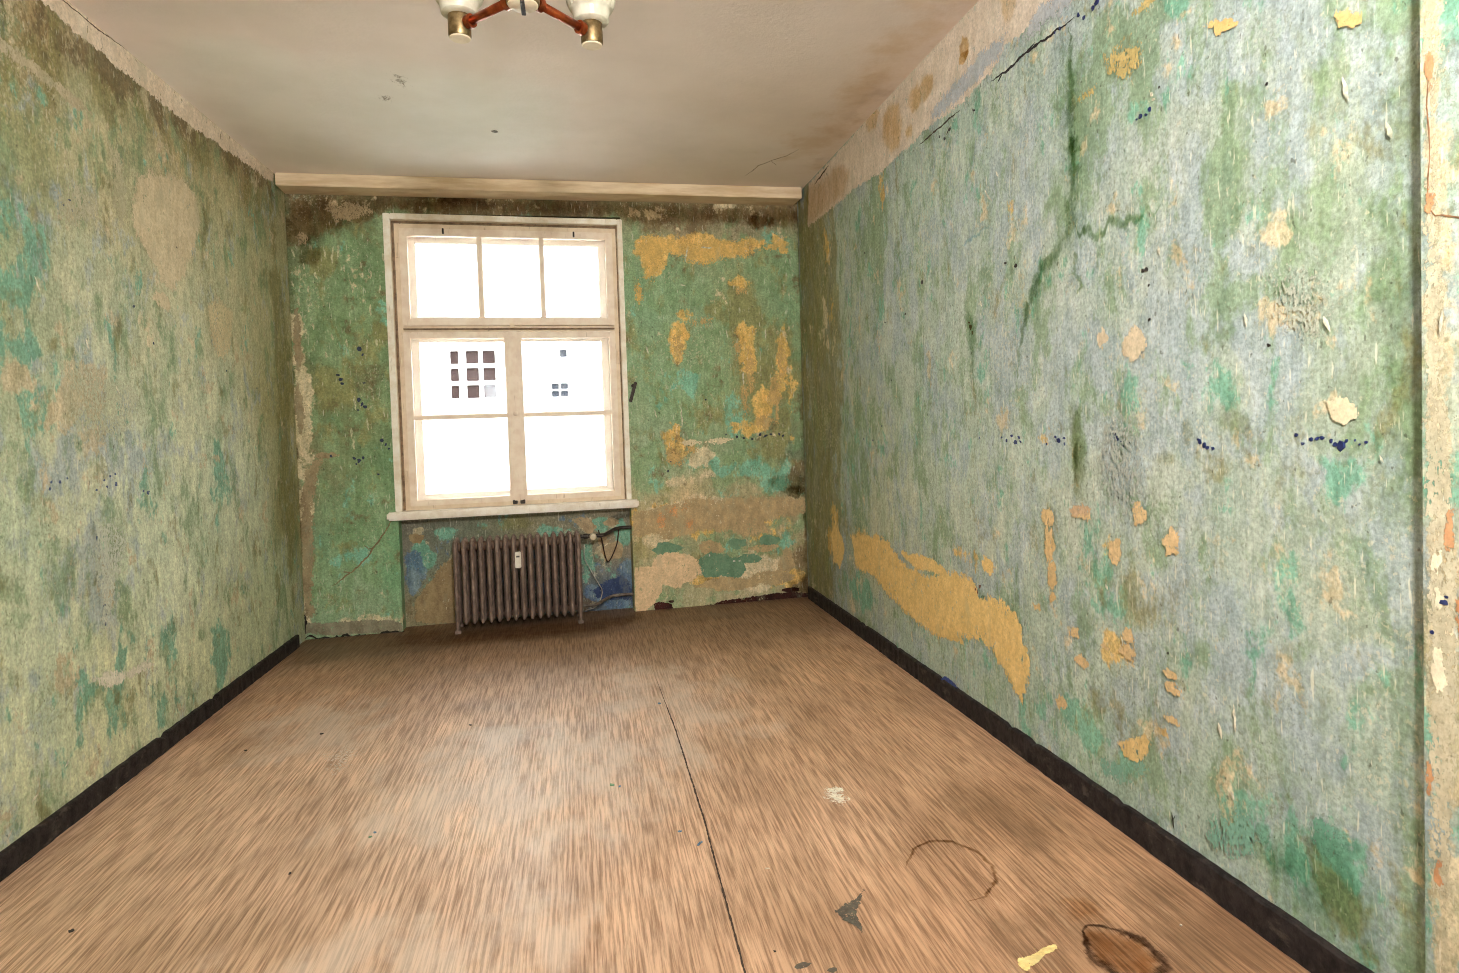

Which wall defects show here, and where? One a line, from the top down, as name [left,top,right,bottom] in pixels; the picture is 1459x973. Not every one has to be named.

peeling [808,0,1080,227]
crack [920,0,1099,144]
peeling [1077,41,1143,103]
peeling [1204,18,1238,36]
flaking render [1097,318,1151,362]
flaking render [1294,396,1368,452]
peeling [572,494,808,611]
peeling [1033,396,1160,611]
peeling [1162,526,1180,556]
spalling [1420,0,1459,966]
peeling [831,520,1031,704]
peeling [1098,733,1151,785]